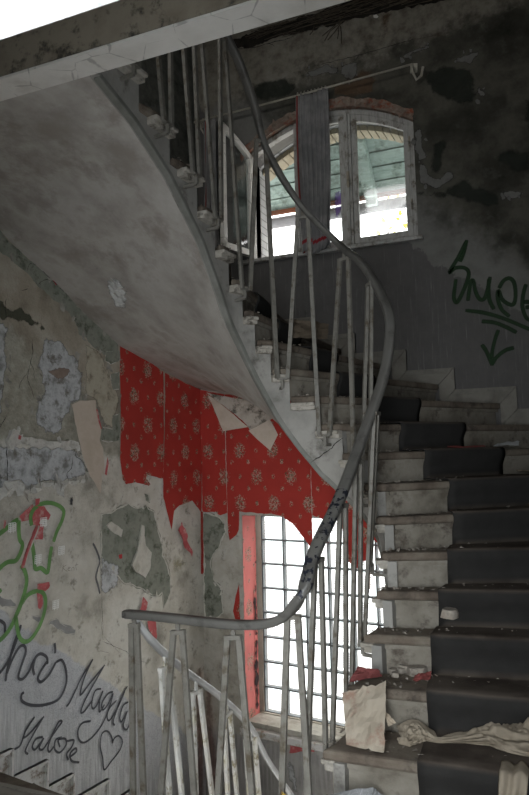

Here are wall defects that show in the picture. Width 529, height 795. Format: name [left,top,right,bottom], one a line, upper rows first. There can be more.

leakage [426,66,476,103]
flaking render [240,111,296,162]
flaking render [329,96,454,189]
peeling [0,230,120,502]
flaking render [99,493,173,608]